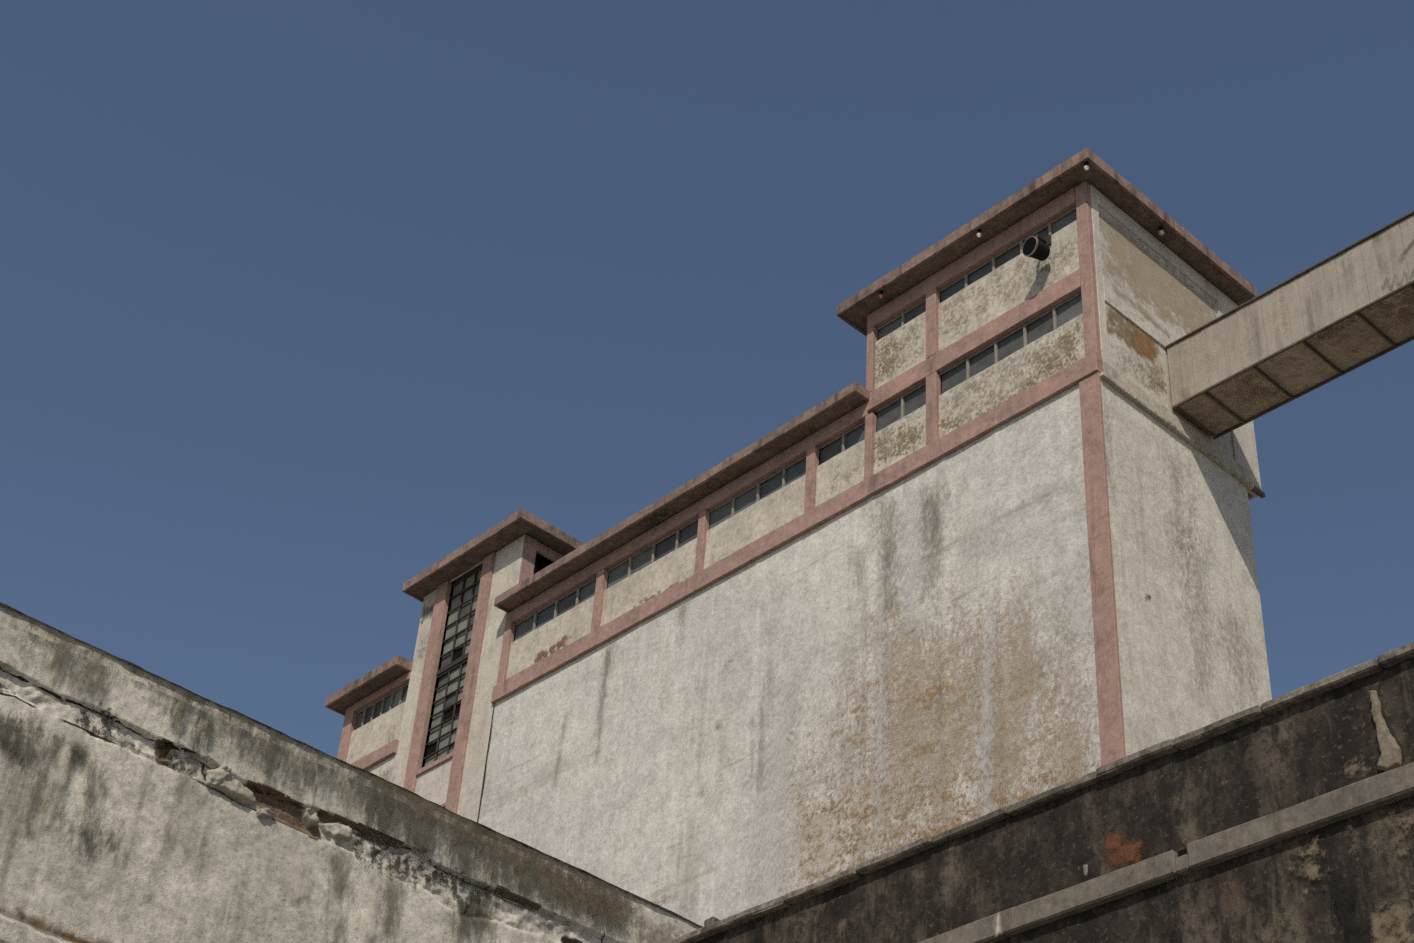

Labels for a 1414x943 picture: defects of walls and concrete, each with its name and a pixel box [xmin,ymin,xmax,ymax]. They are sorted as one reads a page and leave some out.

corrosion [1106,308,1158,361]
crack [0,667,319,814]
damp [0,610,683,943]
crack [477,708,495,823]
damp [1345,758,1371,775]
flaking render [1368,690,1404,771]
crack [399,846,494,892]